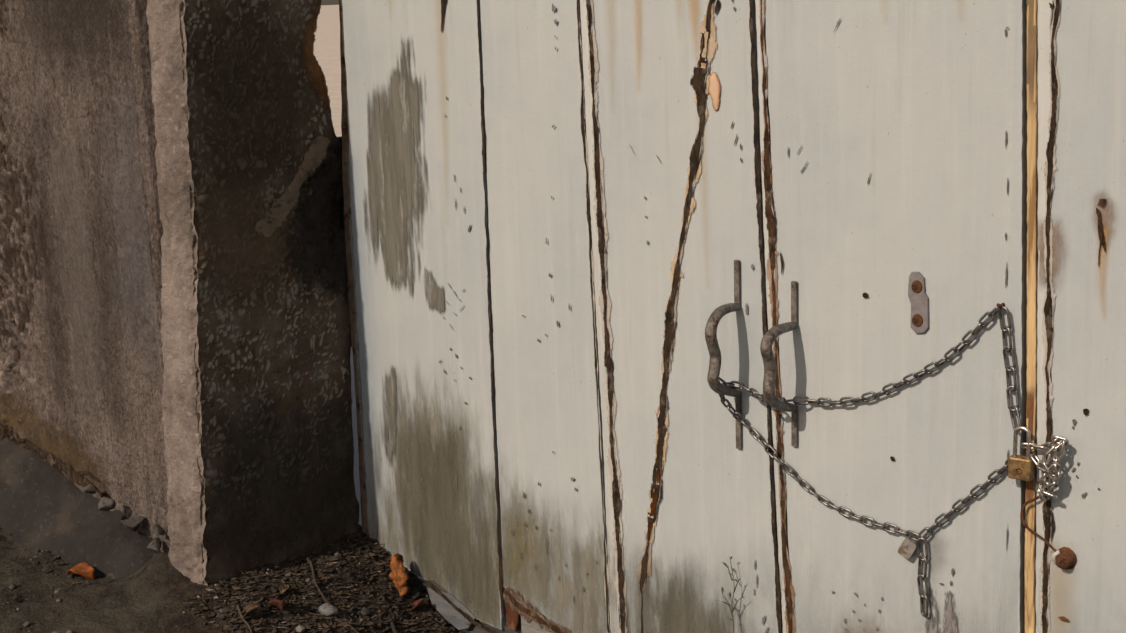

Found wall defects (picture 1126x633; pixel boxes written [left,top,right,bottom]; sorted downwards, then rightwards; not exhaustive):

damp [399,428,489,617]
crack [576,0,720,633]
crack [749,0,796,633]
crack [1039,0,1061,633]
corrosion [1095,197,1112,240]